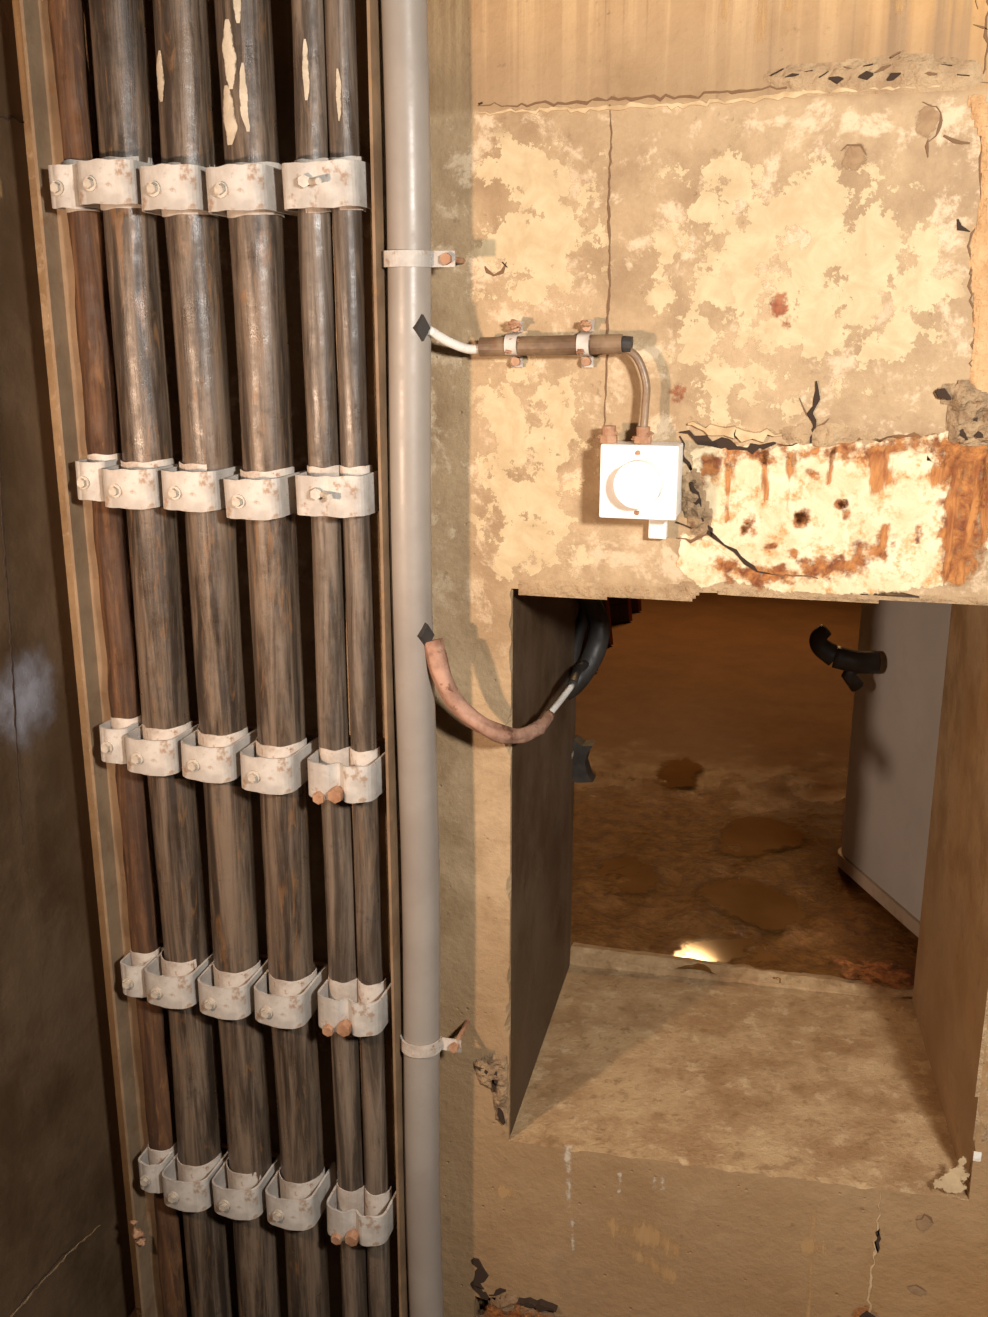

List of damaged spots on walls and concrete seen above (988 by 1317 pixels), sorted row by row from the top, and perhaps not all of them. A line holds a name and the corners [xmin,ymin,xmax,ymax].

crack [973,0,988,83]
crack [477,85,941,425]
peeling [469,51,988,606]
rust [700,436,988,589]
spalling [474,1053,507,1125]
spalling [973,993,988,1162]
spalling [488,1293,561,1317]
crack [867,1192,881,1312]